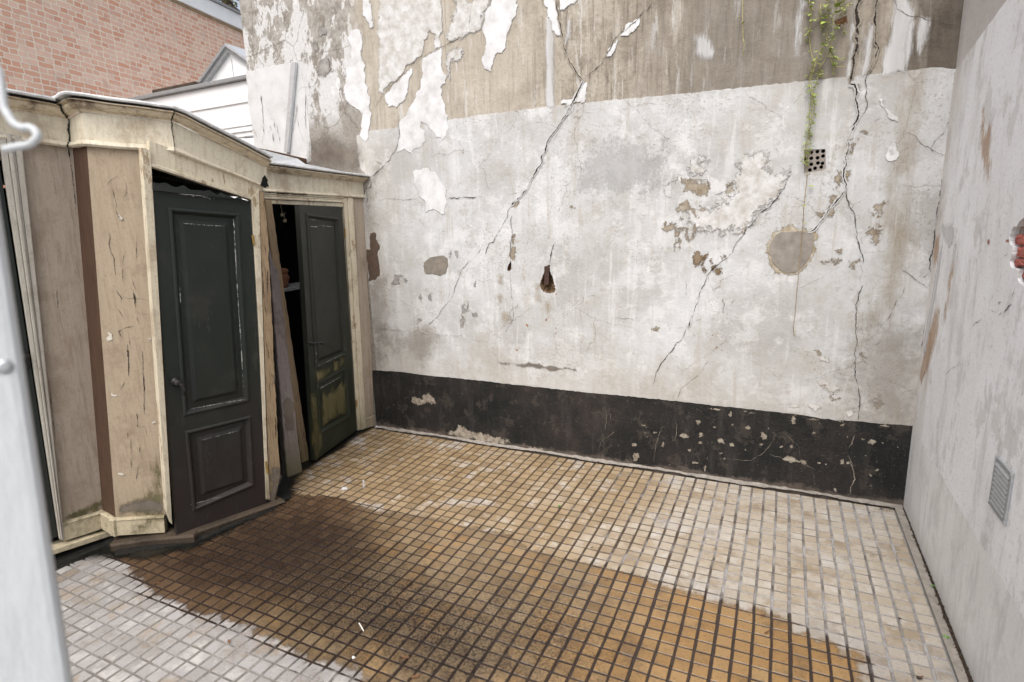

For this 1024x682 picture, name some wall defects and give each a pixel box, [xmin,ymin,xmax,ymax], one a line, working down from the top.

peeling [312,0,518,154]
crack [108,155,147,479]
peeling [413,168,447,215]
spalling [507,234,516,271]
crack [367,0,667,336]
spalling [540,265,556,293]
crack [654,177,789,381]
peeling [661,149,792,275]
crack [807,0,951,494]
flaking render [1006,227,1024,279]
peeling [679,420,746,471]
damp [100,468,879,682]